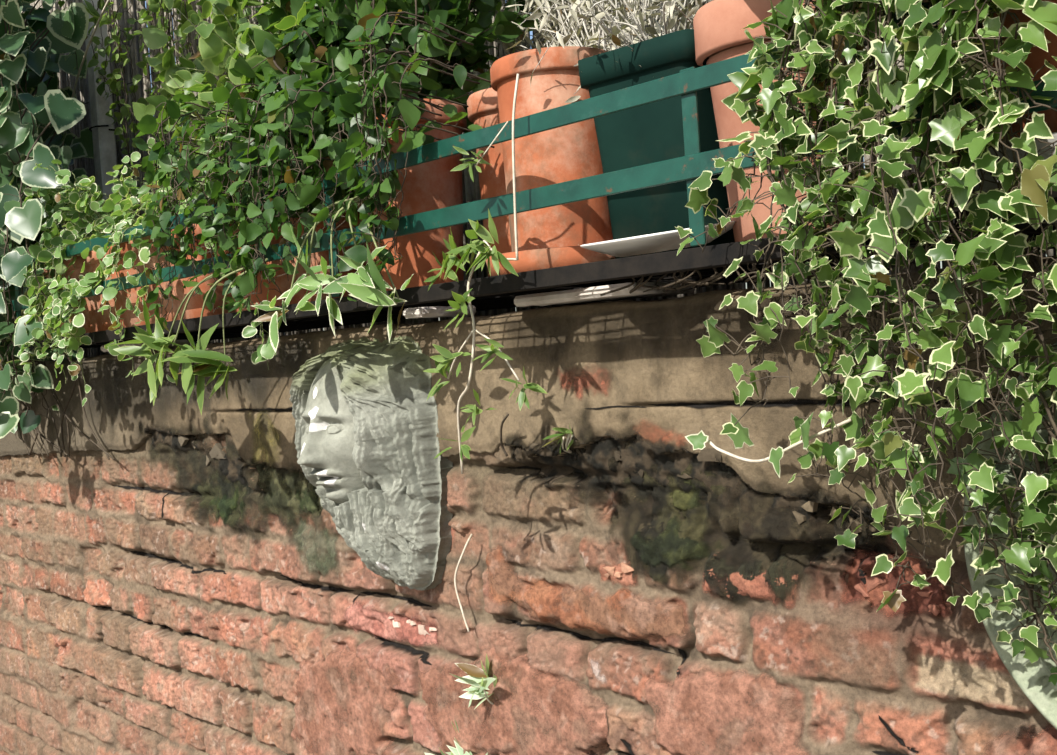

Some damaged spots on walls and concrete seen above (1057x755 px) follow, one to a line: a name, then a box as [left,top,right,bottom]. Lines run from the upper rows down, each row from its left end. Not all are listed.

damp [140,419,306,540]
damp [505,409,600,461]
damp [547,429,686,578]
crack [584,398,887,410]
spalling [703,549,799,608]
damp [661,474,889,604]
spalling [772,490,951,617]
crack [936,396,998,404]